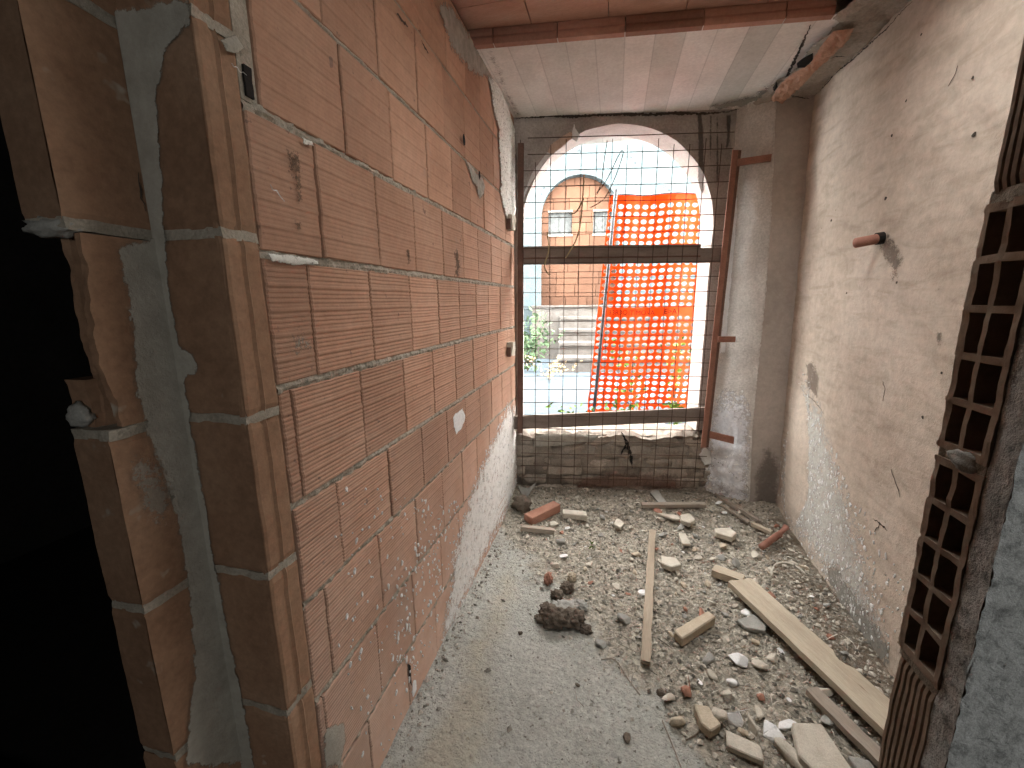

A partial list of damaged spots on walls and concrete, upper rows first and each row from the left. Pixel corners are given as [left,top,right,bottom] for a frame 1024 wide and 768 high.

spalling [771,28,854,104]
crack [785,5,908,99]
water stain [706,373,904,664]